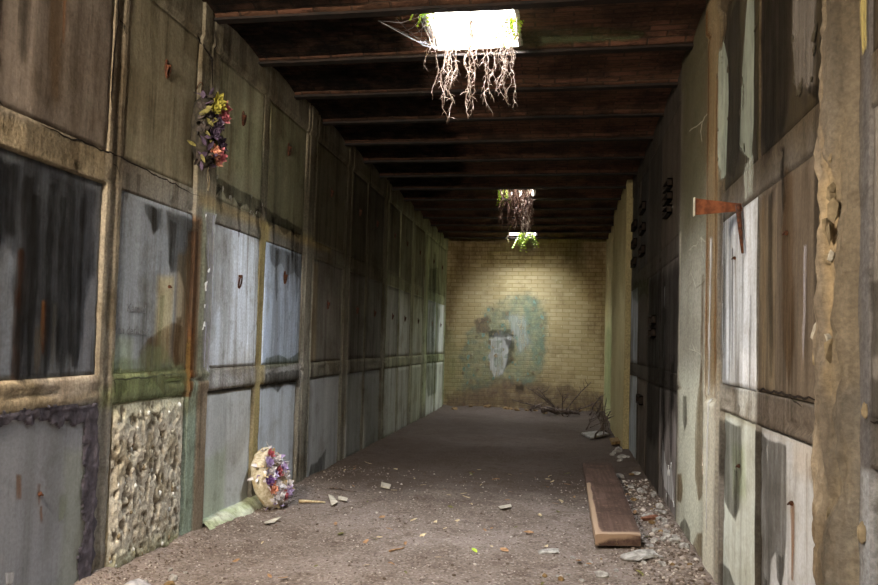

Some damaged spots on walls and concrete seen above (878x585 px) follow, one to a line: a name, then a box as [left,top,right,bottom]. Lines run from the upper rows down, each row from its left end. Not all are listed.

damp [0,155,96,382]
peeling [460,296,545,387]
spalling [106,397,184,568]
damp [755,432,777,561]